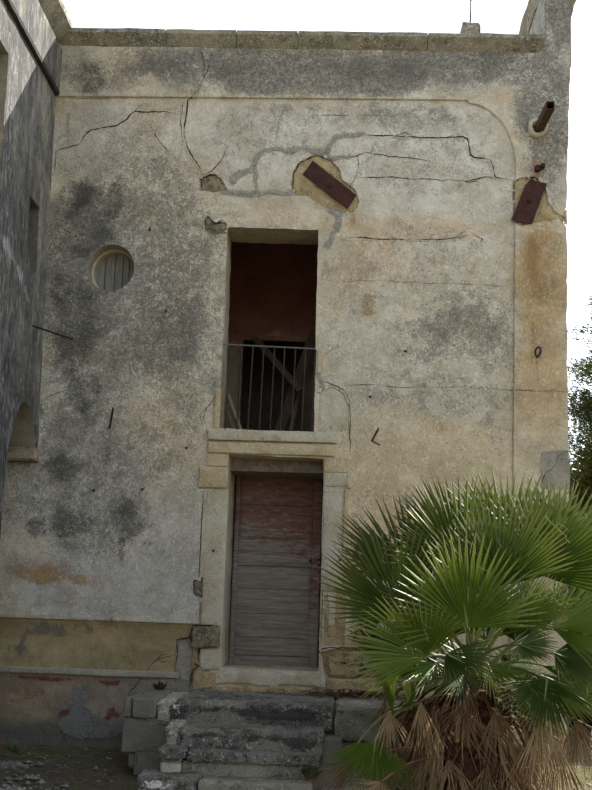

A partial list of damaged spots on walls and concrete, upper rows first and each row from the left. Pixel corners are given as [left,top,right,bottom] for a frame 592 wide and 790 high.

crack [54,51,228,176]
crack [330,115,519,188]
spalling [198,174,227,192]
spalling [204,215,229,235]
spalling [291,154,359,214]
spalling [511,175,539,210]
spalling [511,188,567,226]
leakage [50,273,105,413]
leakage [26,496,145,561]